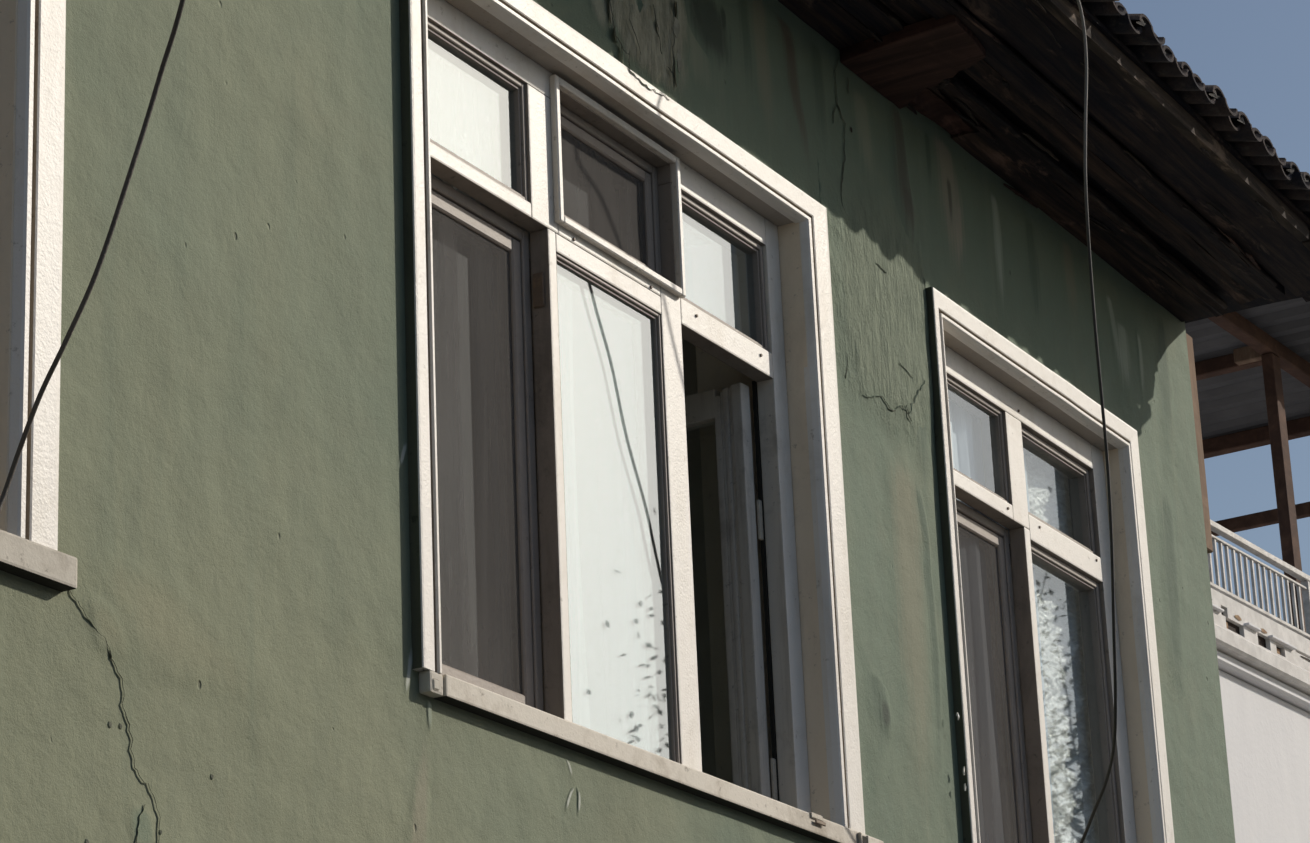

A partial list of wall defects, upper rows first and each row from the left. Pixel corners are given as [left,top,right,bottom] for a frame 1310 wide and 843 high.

flaking render [586,0,698,116]
damp [987,185,1009,337]
crack [868,363,925,421]
crack [70,591,160,843]